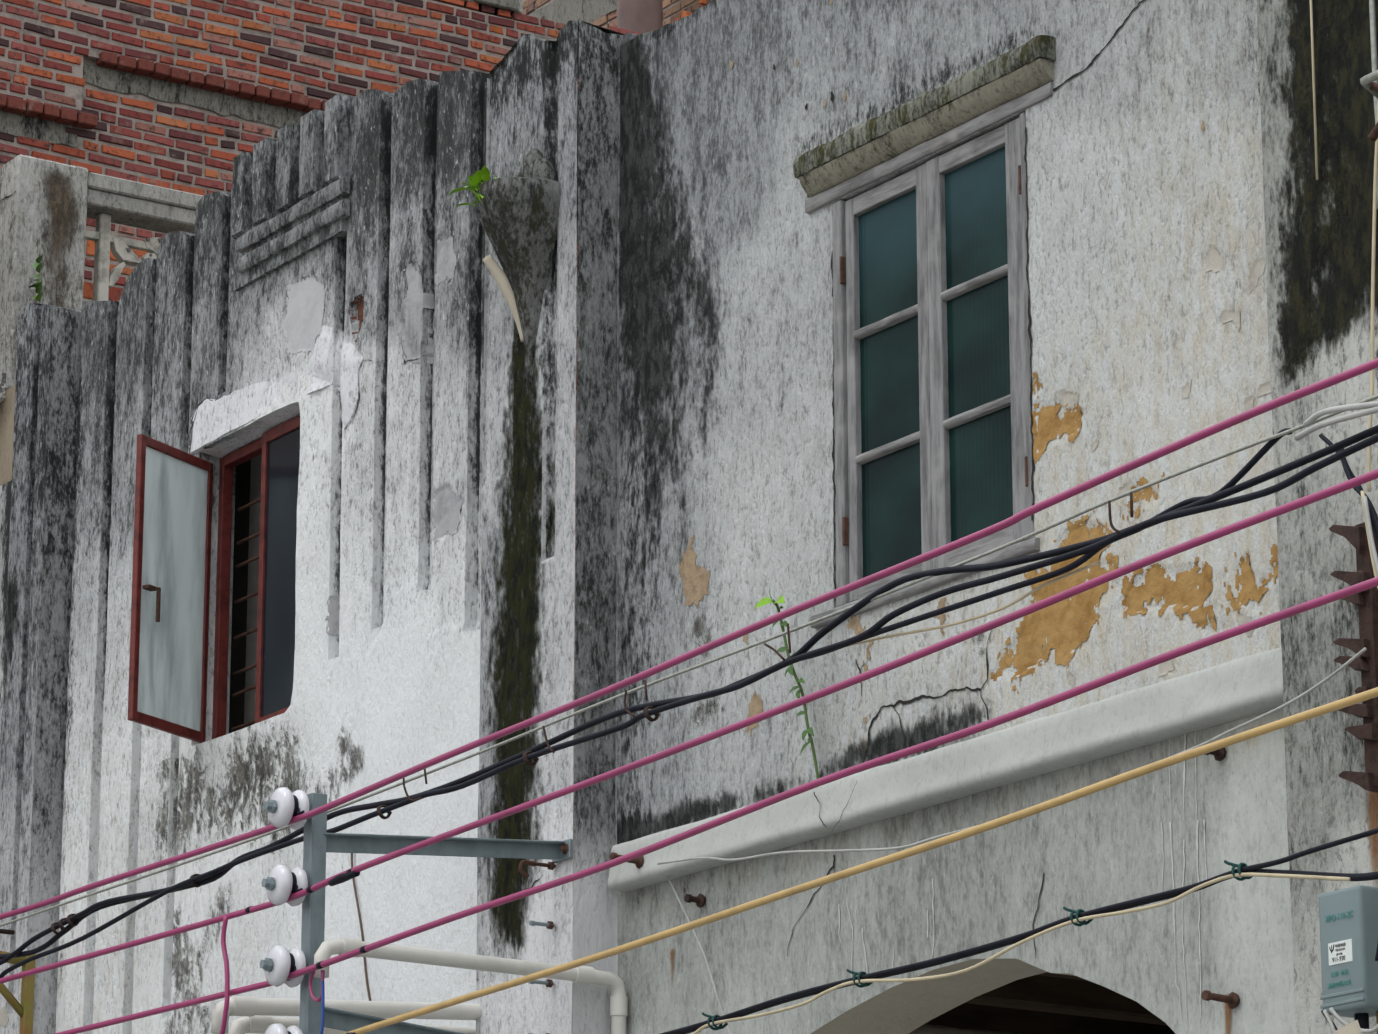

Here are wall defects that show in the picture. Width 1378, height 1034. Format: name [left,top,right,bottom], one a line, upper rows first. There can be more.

crack [1053,0,1145,92]
damp [1270,0,1378,383]
damp [618,34,725,713]
flaking render [1030,372,1098,464]
damp [488,319,555,840]
flaking render [679,534,710,607]
flaking render [990,472,1278,694]
damp [155,723,364,861]
damp [617,776,800,844]
crack [787,630,992,957]
damp [819,703,990,778]
damp [487,858,538,954]